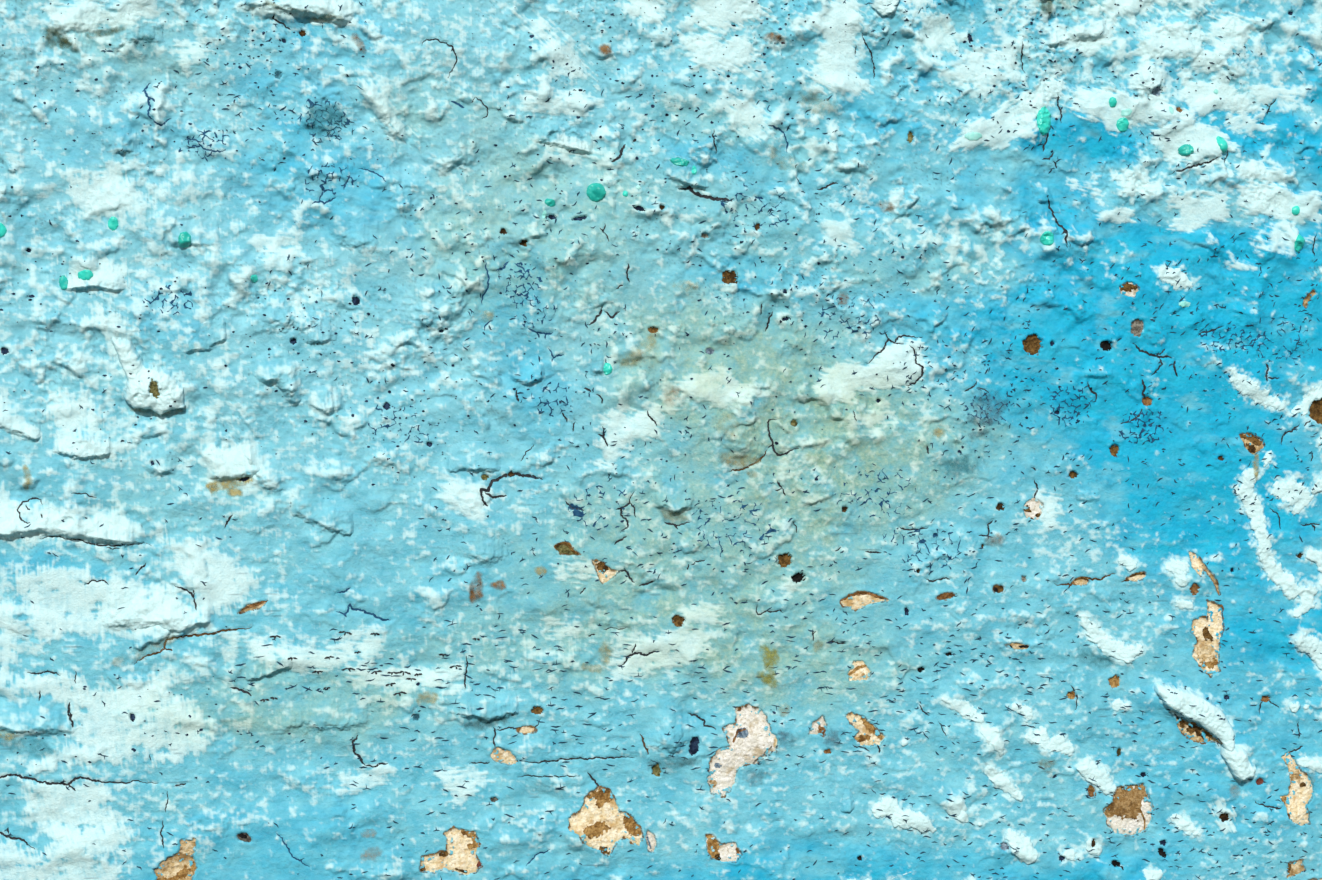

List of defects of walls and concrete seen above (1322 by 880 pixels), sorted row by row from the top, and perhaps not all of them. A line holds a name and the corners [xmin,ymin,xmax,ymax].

crack [174,581,207,614]
spalling [840,591,889,612]
spalling [1189,551,1225,678]
crack [0,627,251,870]
spalling [707,704,780,798]
spalling [568,785,656,857]
spalling [1088,783,1155,837]
spalling [1280,752,1313,826]
spalling [154,838,197,880]
spalling [419,826,483,876]
spalling [1286,859,1322,880]